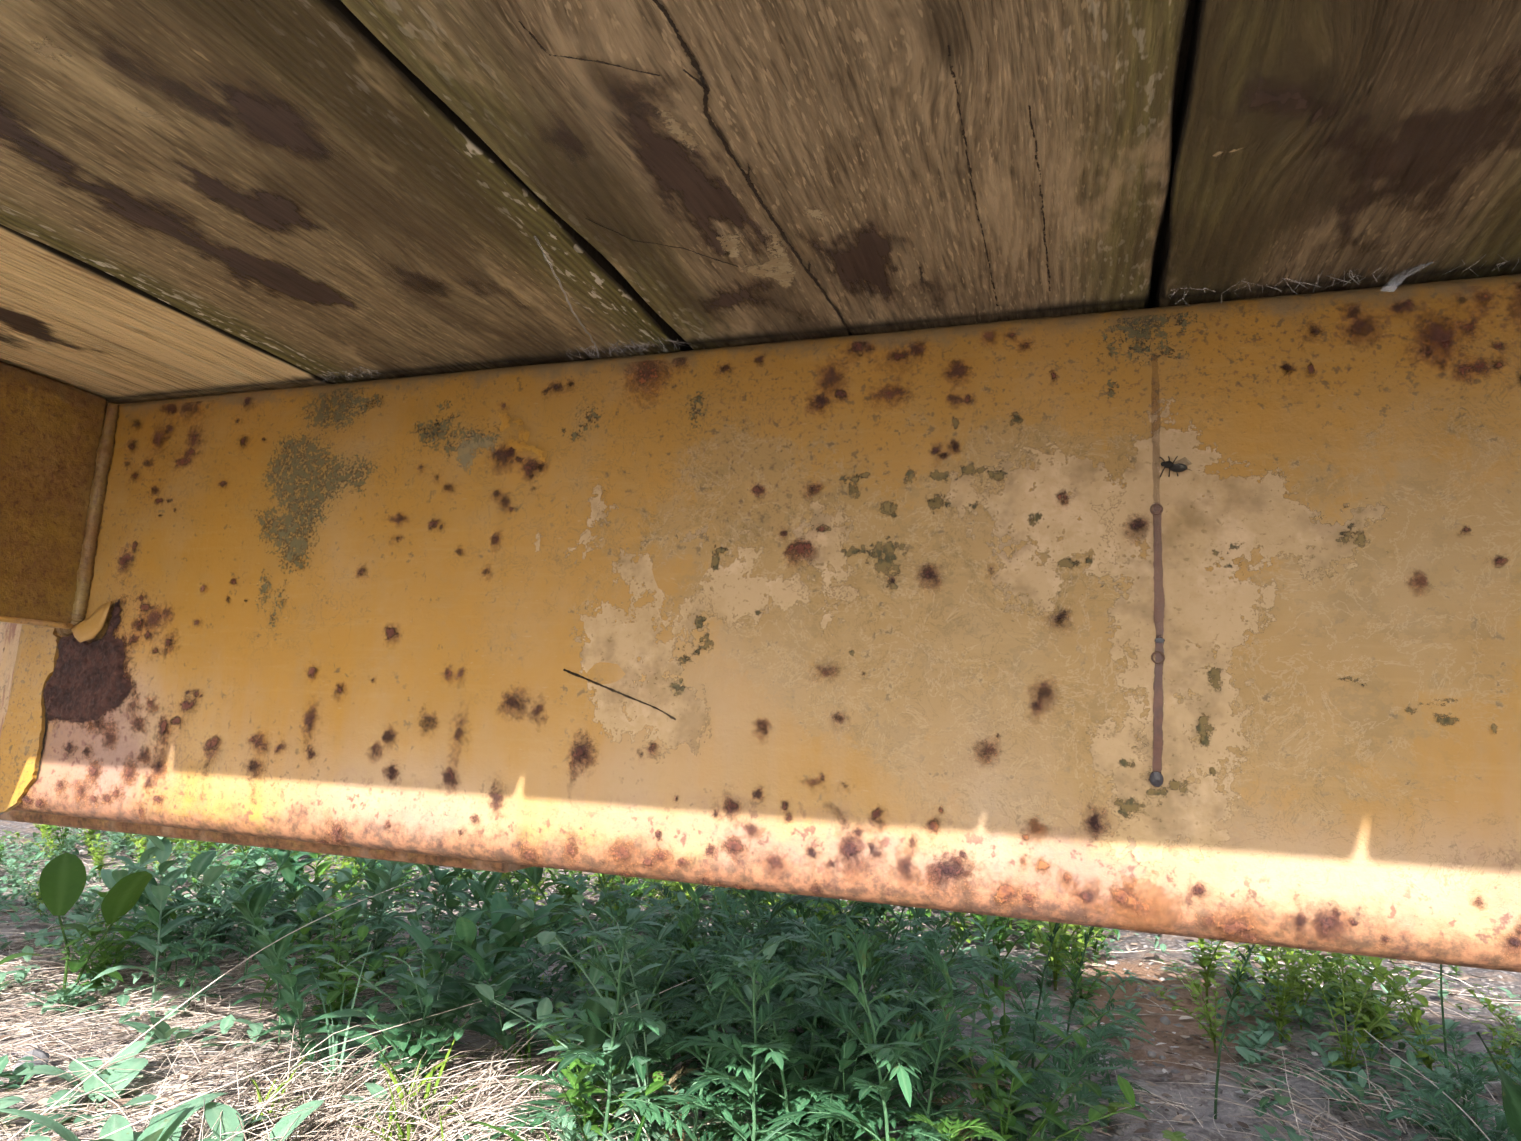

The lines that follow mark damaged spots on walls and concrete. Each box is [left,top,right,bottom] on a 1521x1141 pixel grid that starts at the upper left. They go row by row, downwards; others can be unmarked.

leakage [0,307,104,354]
leakage [0,101,357,309]
crack [518,0,852,335]
leakage [614,84,772,256]
leakage [807,222,898,302]
crack [947,45,998,306]
crack [1028,105,1051,291]
peeling [563,484,860,763]
peeling [939,387,1389,872]
corrosion [706,825,756,854]
corrosion [808,808,882,867]
corrosion [929,851,970,881]